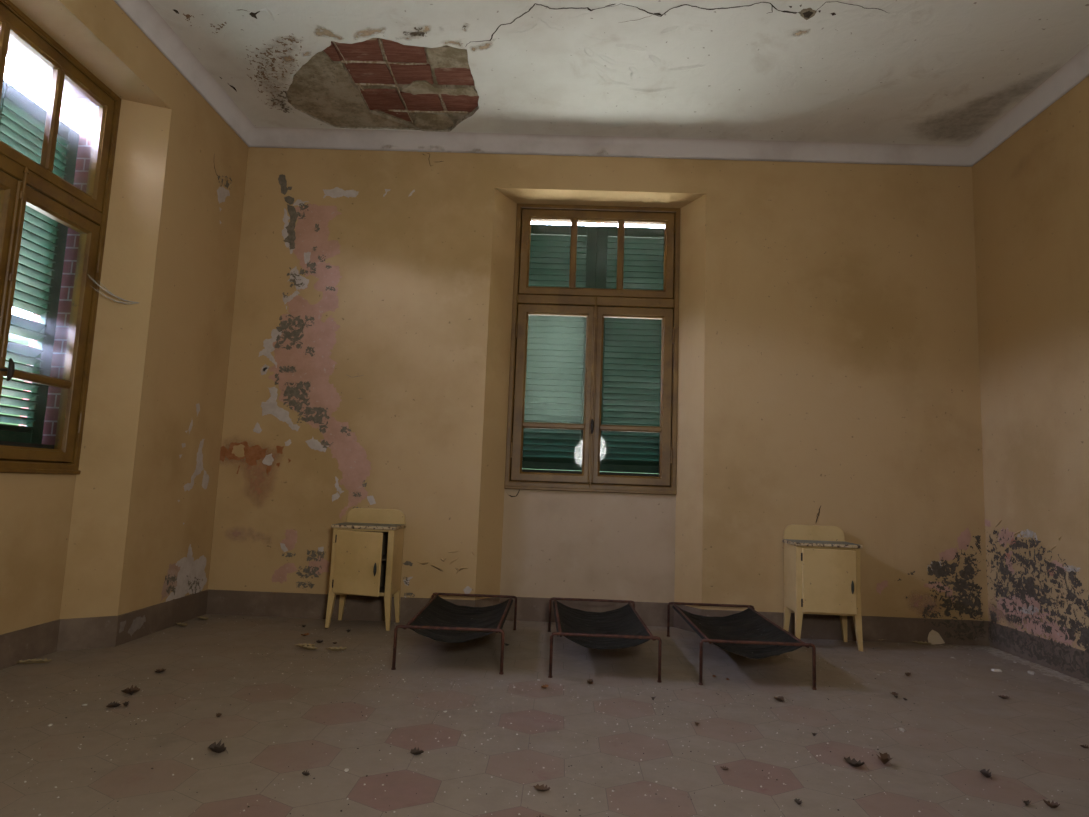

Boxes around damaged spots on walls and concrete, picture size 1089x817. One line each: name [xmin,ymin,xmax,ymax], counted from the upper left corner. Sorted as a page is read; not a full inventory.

crack [465,1,886,47]
spalling [245,36,479,132]
peeling [253,174,376,520]
peeling [161,544,207,602]
water stain [876,519,1089,691]